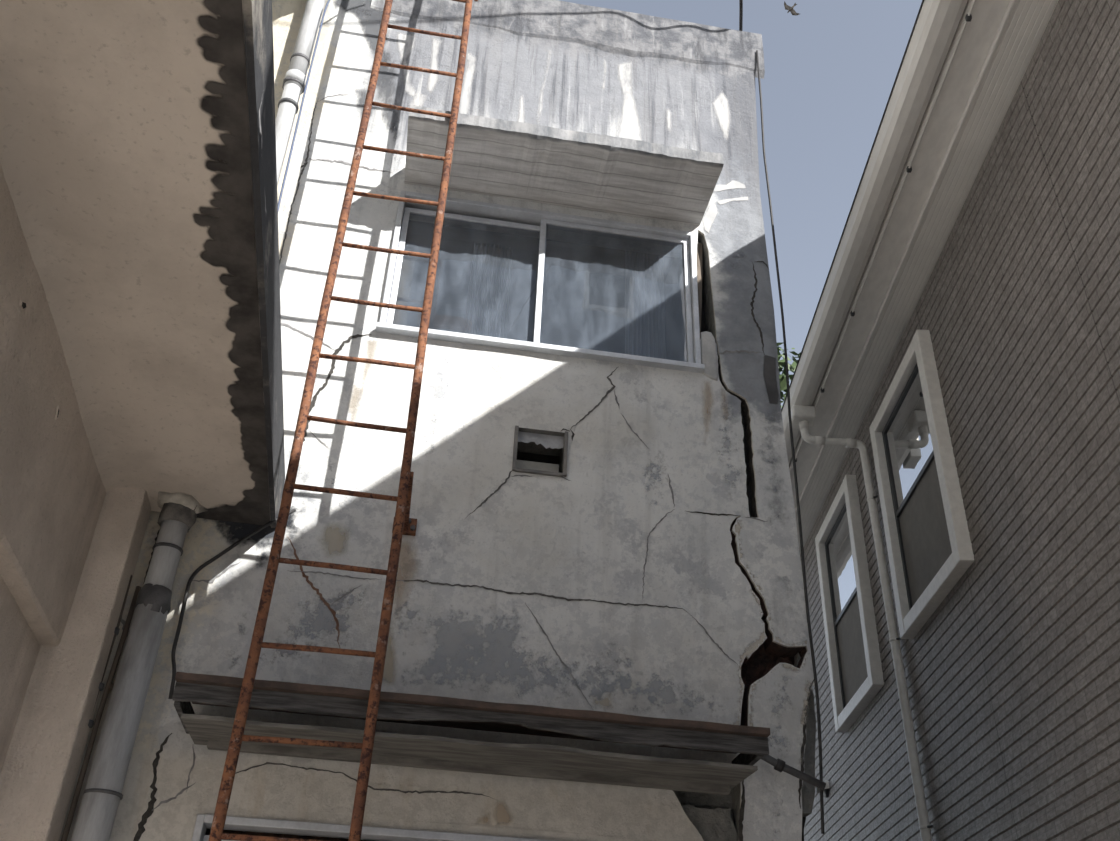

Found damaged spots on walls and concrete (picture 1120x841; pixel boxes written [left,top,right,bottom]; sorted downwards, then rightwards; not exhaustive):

leakage [336,0,440,137]
leakage [459,54,475,114]
leakage [618,63,641,141]
leakage [713,93,729,136]
crack [279,94,393,265]
leakage [193,0,297,566]
crack [281,261,769,706]
crack [133,733,196,841]
crack [235,762,496,800]